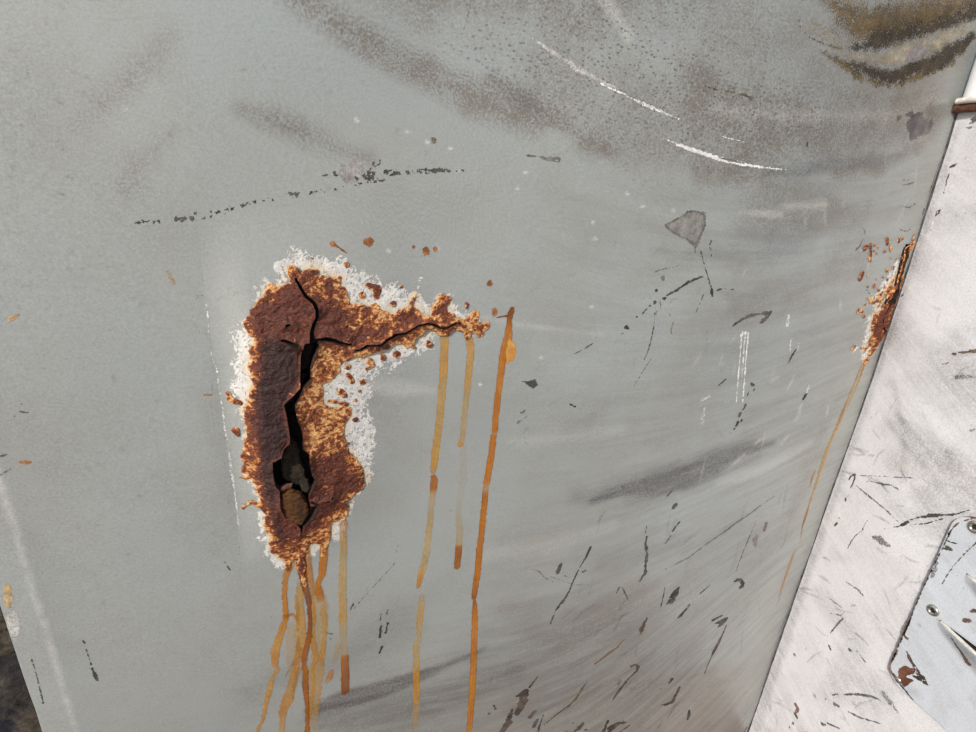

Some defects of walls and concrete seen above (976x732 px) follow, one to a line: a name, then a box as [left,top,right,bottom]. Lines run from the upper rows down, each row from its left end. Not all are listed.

rust [225,241,516,732]
rust [802,234,916,527]